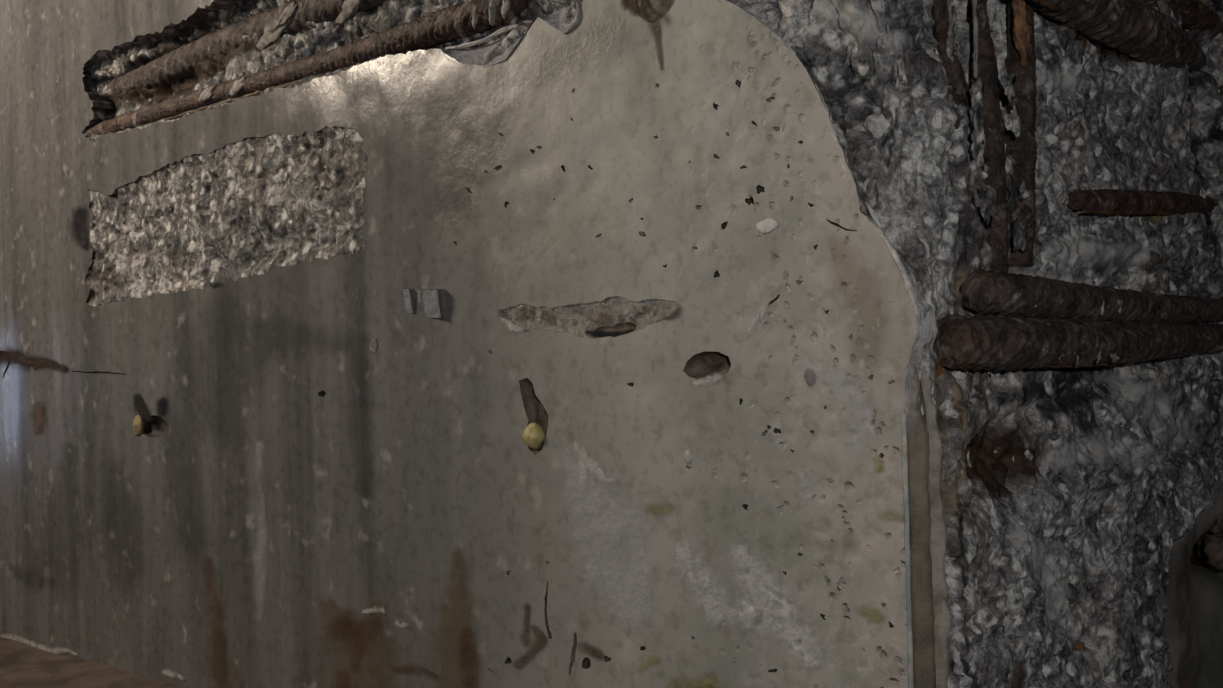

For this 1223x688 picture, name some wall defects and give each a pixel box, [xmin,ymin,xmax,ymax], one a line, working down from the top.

corrosion [98,40,259,109]
spalling [84,0,583,142]
spalling [85,126,369,307]
spalling [498,296,681,339]
spalling [726,0,1223,688]
corrosion [964,429,1039,497]